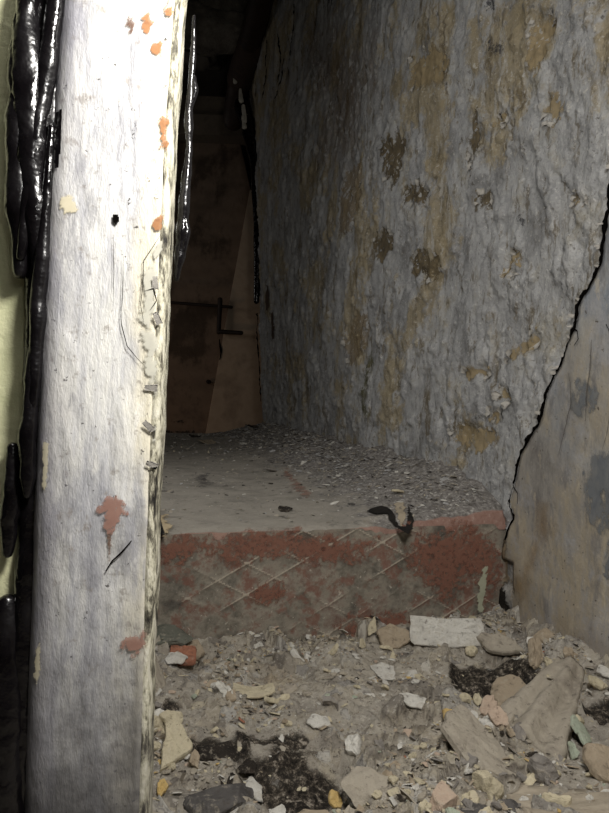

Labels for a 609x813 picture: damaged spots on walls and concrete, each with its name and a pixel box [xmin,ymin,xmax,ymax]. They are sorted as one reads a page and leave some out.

corrosion [126,12,154,34]
corrosion [150,41,163,55]
peeling [525,8,557,77]
peeling [540,91,565,128]
corrosion [158,114,170,154]
peeling [465,107,480,172]
peeling [379,127,430,209]
peeling [473,188,494,212]
peeling [372,226,394,264]
peeling [411,247,442,284]
crack [501,164,609,558]
peeling [447,382,512,455]